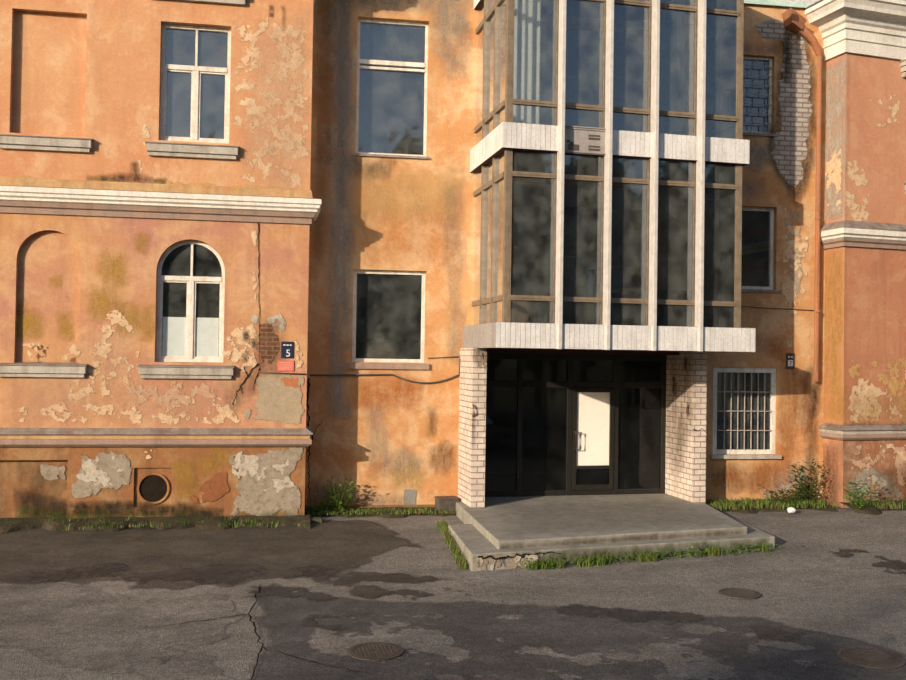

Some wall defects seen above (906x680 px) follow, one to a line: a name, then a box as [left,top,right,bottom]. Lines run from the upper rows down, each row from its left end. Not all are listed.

peeling [231,18,309,190]
flaking render [756,19,813,189]
flaking render [40,310,305,426]
crack [232,223,260,405]
peeling [782,207,811,347]
peeling [847,357,906,424]
peeling [40,464,66,481]
peeling [851,444,906,486]